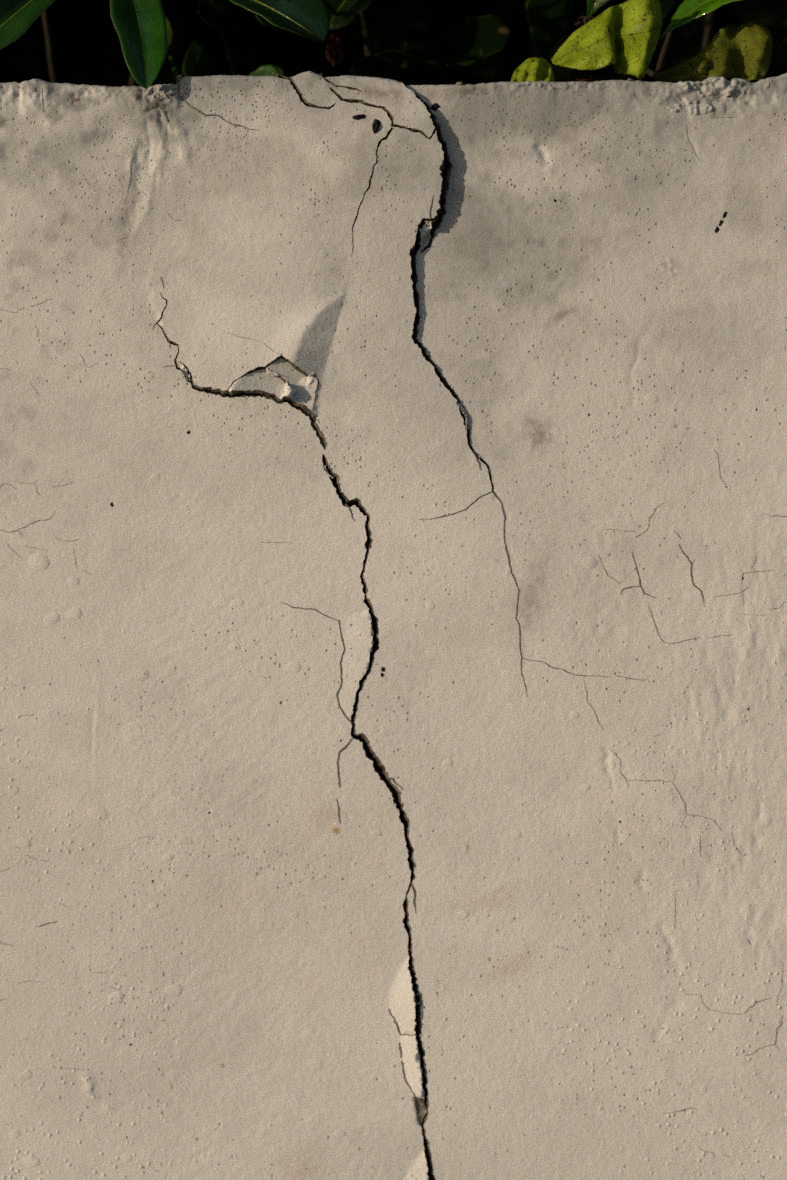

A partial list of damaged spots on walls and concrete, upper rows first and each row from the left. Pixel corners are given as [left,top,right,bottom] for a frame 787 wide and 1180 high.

crack [144,78,255,130]
flaking render [229,355,318,409]
crack [278,73,742,927]
crack [152,276,435,1180]
peeling [386,958,426,1126]
peeling [402,1152,428,1180]